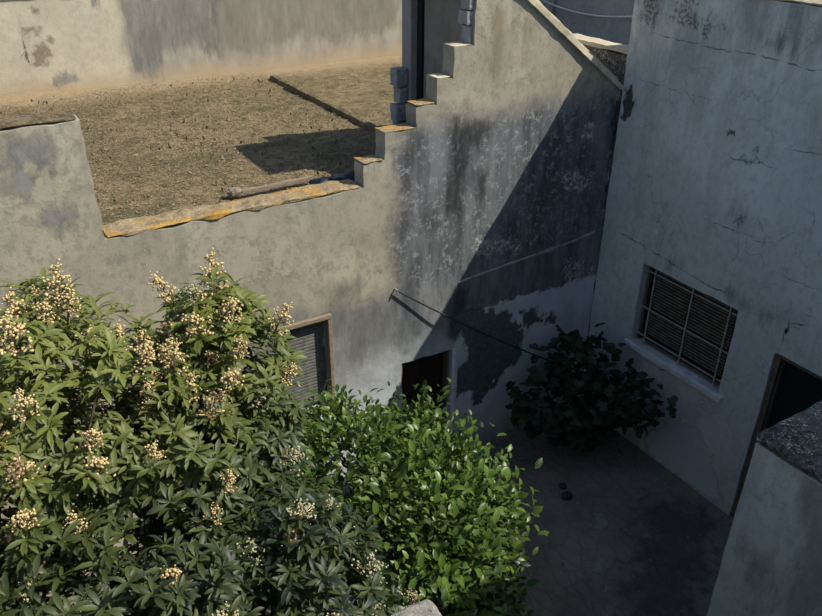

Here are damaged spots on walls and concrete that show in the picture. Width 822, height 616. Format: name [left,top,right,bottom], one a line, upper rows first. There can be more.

flaking render [32,38,54,66]
damp [447,118,489,212]
peeling [454,306,557,406]